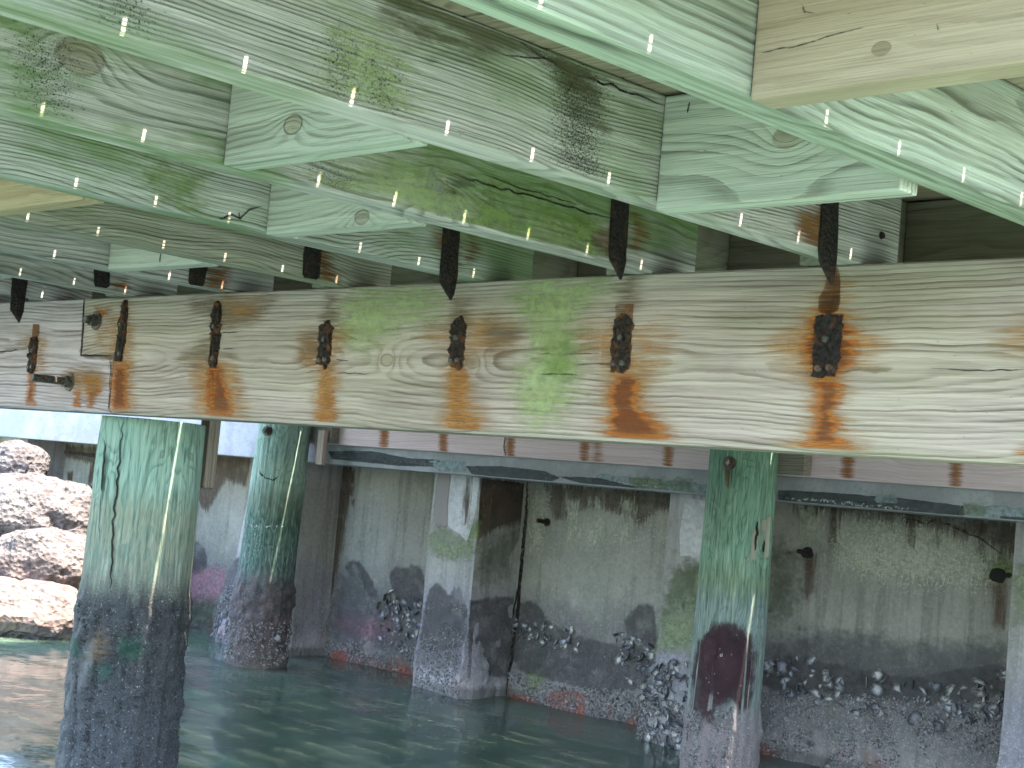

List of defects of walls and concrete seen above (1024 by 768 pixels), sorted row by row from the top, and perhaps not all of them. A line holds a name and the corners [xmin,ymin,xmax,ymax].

leakage [3,27,91,121]
leakage [543,56,614,177]
crack [506,39,659,104]
crack [418,161,636,225]
corrosion [21,324,46,405]
corrosion [72,310,135,410]
corrosion [299,334,339,422]
corrosion [577,276,674,466]
corrosion [772,267,884,478]
crack [81,301,124,588]
crack [506,481,528,695]
peeling [748,515,771,562]